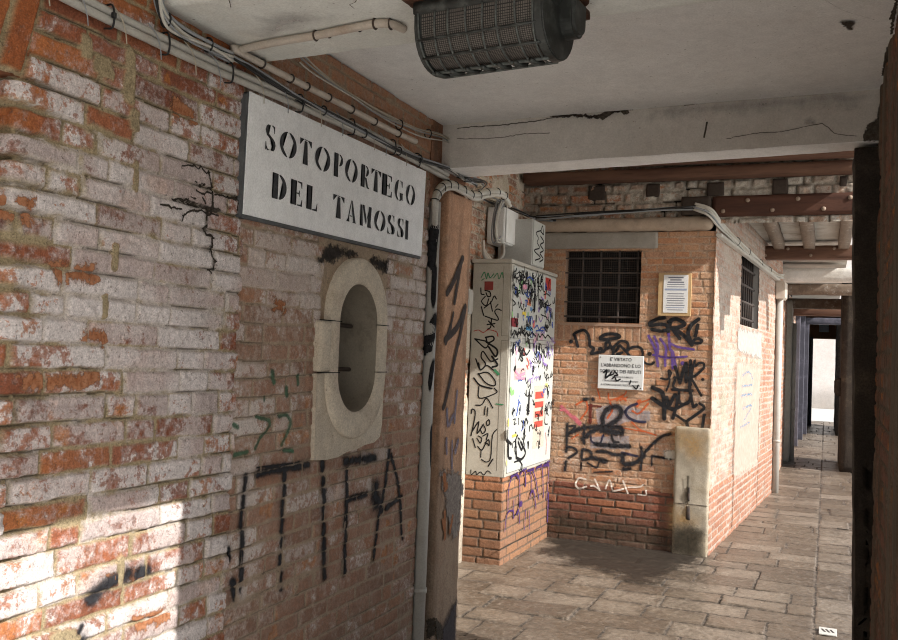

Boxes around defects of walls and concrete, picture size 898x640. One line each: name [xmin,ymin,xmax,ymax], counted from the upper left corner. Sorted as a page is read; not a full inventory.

crack [457,111,620,139]
flaking render [597,110,629,120]
crack [726,123,854,139]
crack [160,164,239,274]
flaking render [439,469,464,541]